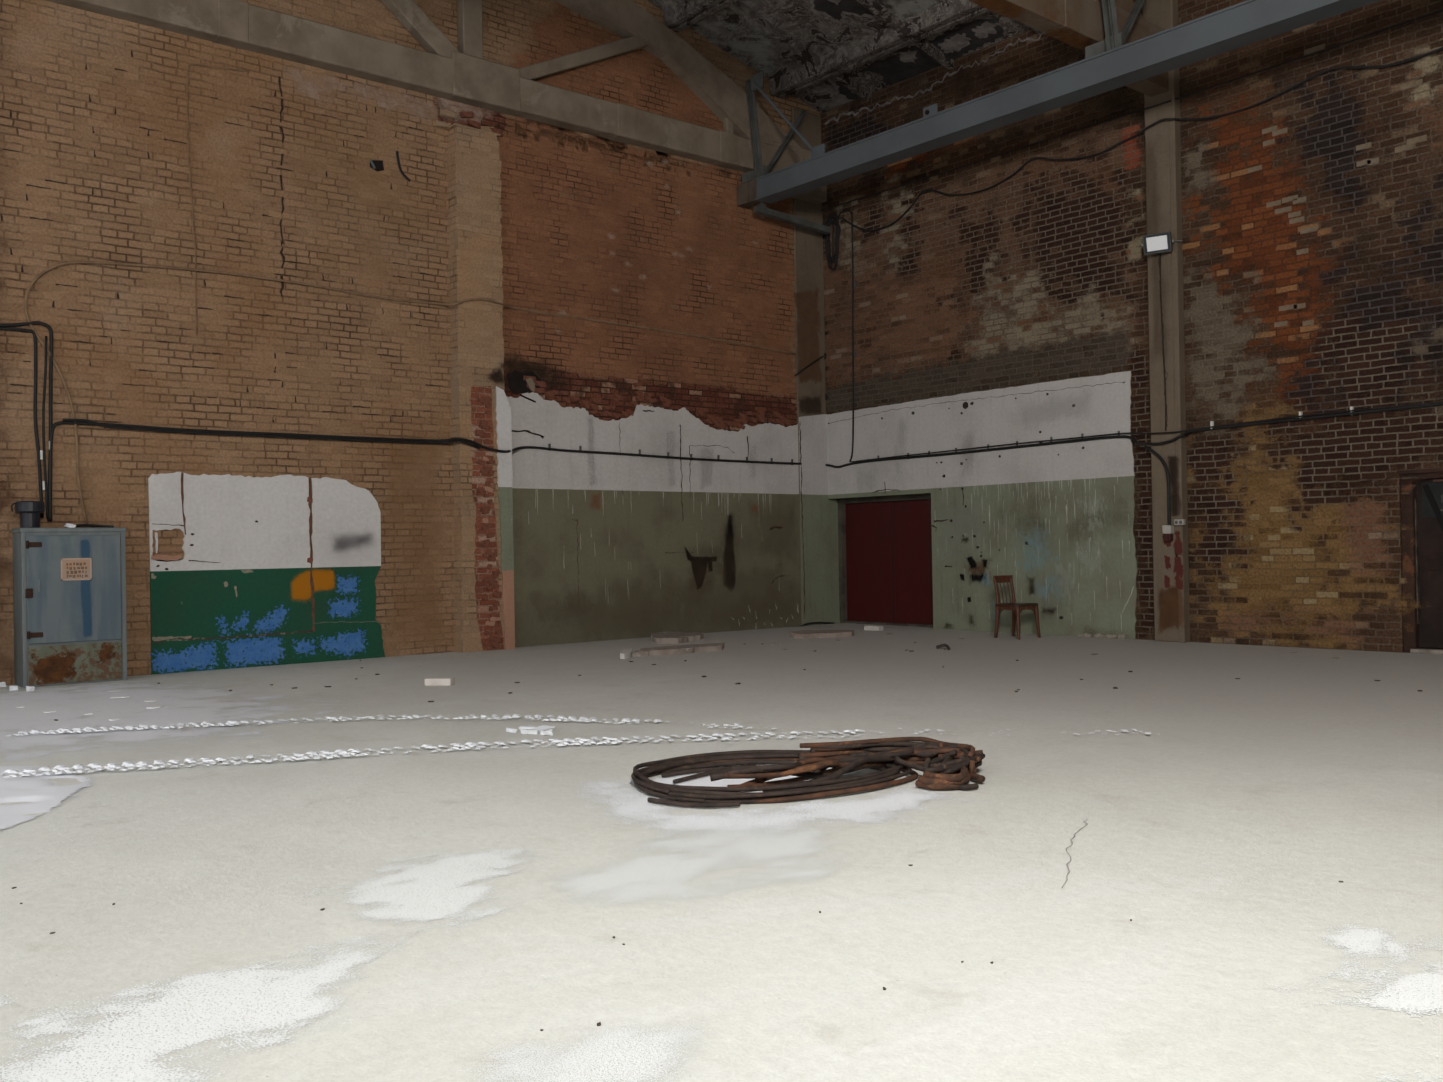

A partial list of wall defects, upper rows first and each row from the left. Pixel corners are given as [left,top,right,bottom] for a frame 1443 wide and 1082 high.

peeling [810,0,878,24]
peeling [856,17,1005,86]
crack [277,76,285,297]
spalling [470,345,797,650]
spalling [151,532,194,579]
peeling [149,569,368,674]